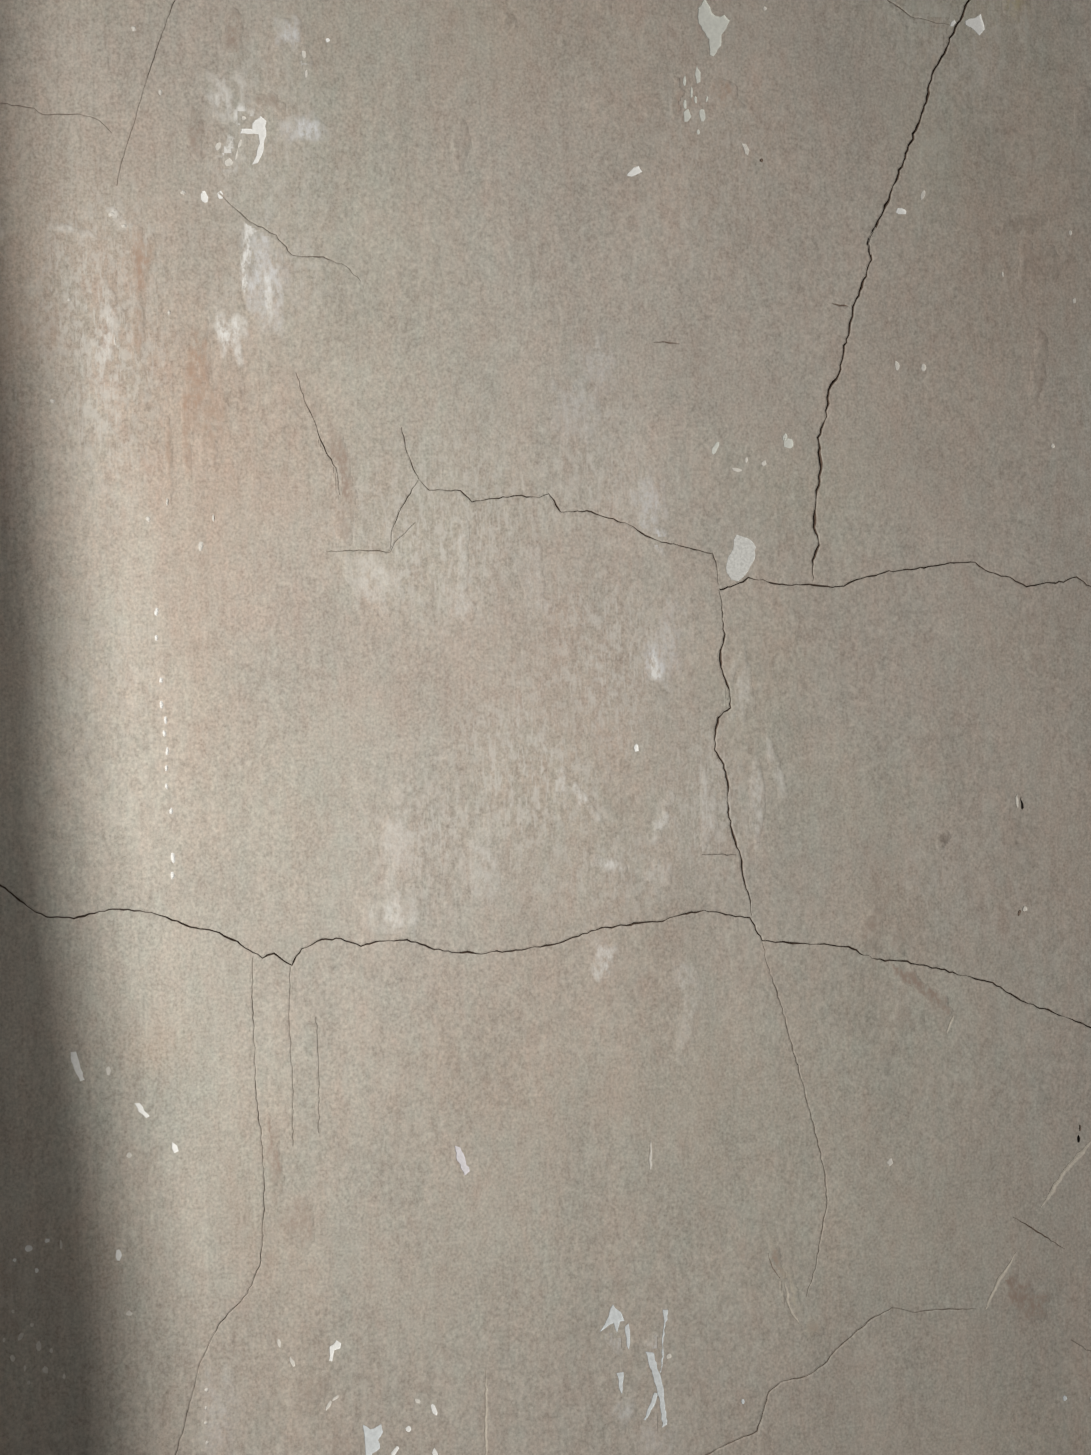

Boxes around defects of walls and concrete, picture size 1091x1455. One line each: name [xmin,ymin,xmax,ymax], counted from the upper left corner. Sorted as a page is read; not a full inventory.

crack [0,0,177,186]
peeling [683,0,730,134]
peeling [950,14,985,36]
crack [218,193,361,282]
crack [296,373,340,495]
crack [327,427,719,585]
crack [713,0,1091,916]
crack [0,882,1091,1298]
crack [174,956,266,1455]
peeling [363,1424,411,1455]
peeling [600,1305,671,1427]
crack [704,1307,976,1455]